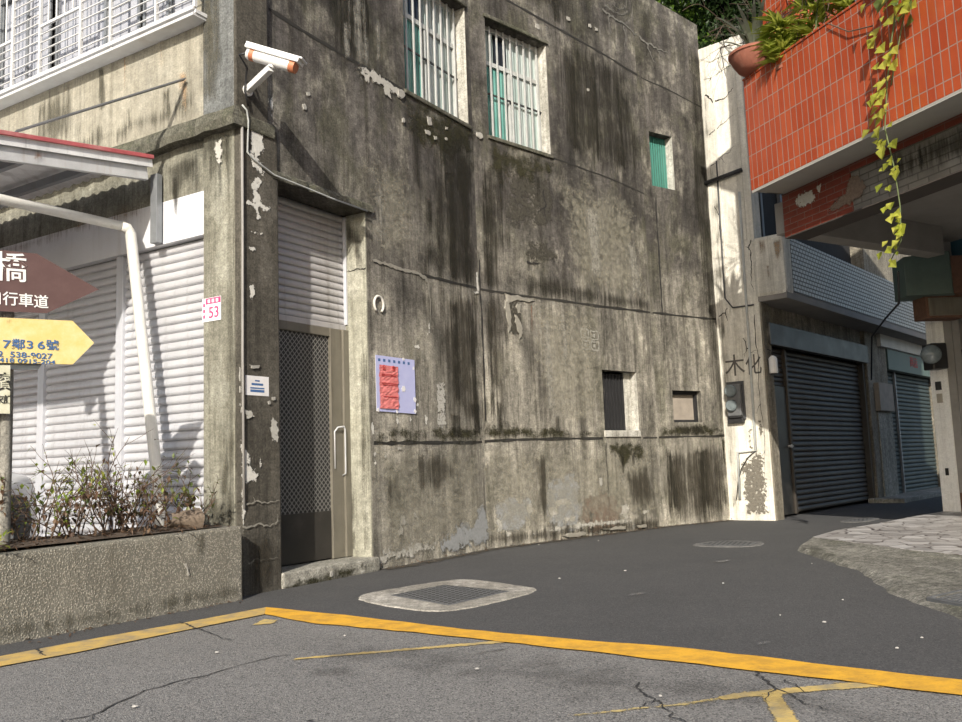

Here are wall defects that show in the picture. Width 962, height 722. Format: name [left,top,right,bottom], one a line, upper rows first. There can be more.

spalling [359,67,405,99]
water stain [564,46,635,167]
peeling [246,131,270,220]
water stain [588,210,600,274]
water stain [691,57,724,359]
spalling [795,183,821,207]
water stain [362,144,592,468]
water stain [419,456,451,486]
water stain [621,454,651,502]
water stain [663,373,734,517]
crack [743,315,766,486]
water stain [491,519,657,542]